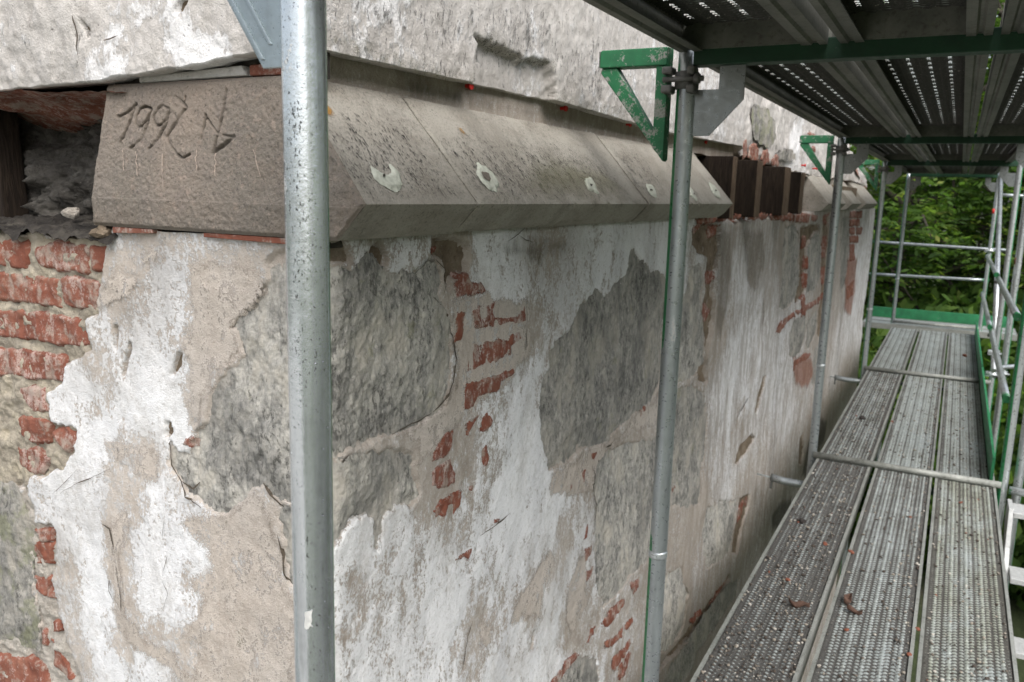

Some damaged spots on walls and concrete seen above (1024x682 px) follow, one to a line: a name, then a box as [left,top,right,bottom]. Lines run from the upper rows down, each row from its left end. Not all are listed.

flaking render [742,104,796,167]
flaking render [0,230,163,682]
crack [169,442,201,508]
crack [392,261,457,435]
flaking render [330,238,532,550]
flaking render [539,248,665,682]
flaking render [692,212,829,386]
flaking render [840,210,863,299]